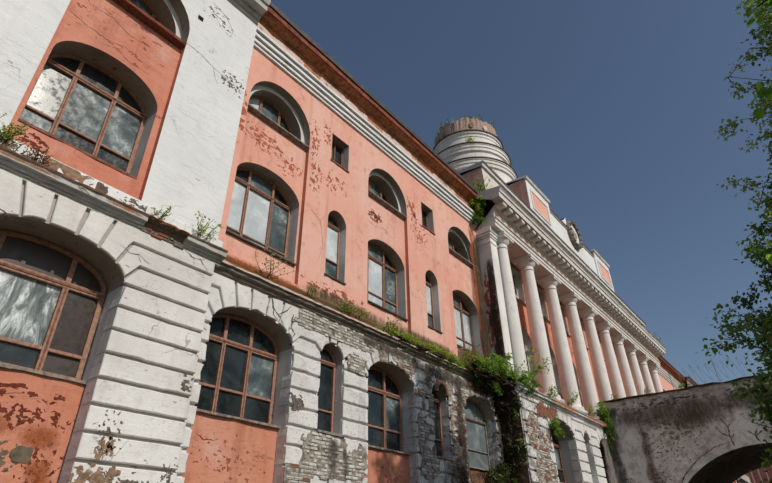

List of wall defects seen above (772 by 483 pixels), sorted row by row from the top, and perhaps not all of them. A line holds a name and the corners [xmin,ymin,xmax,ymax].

flaking render [14,130,147,212]
peeling [221,70,347,198]
peeling [407,196,427,250]
water stain [307,238,505,362]
peeling [0,382,76,483]
flaking render [69,410,178,483]
peeling [190,440,266,483]
flaking render [283,308,471,483]
flaking render [526,402,560,483]
water stain [603,390,772,483]